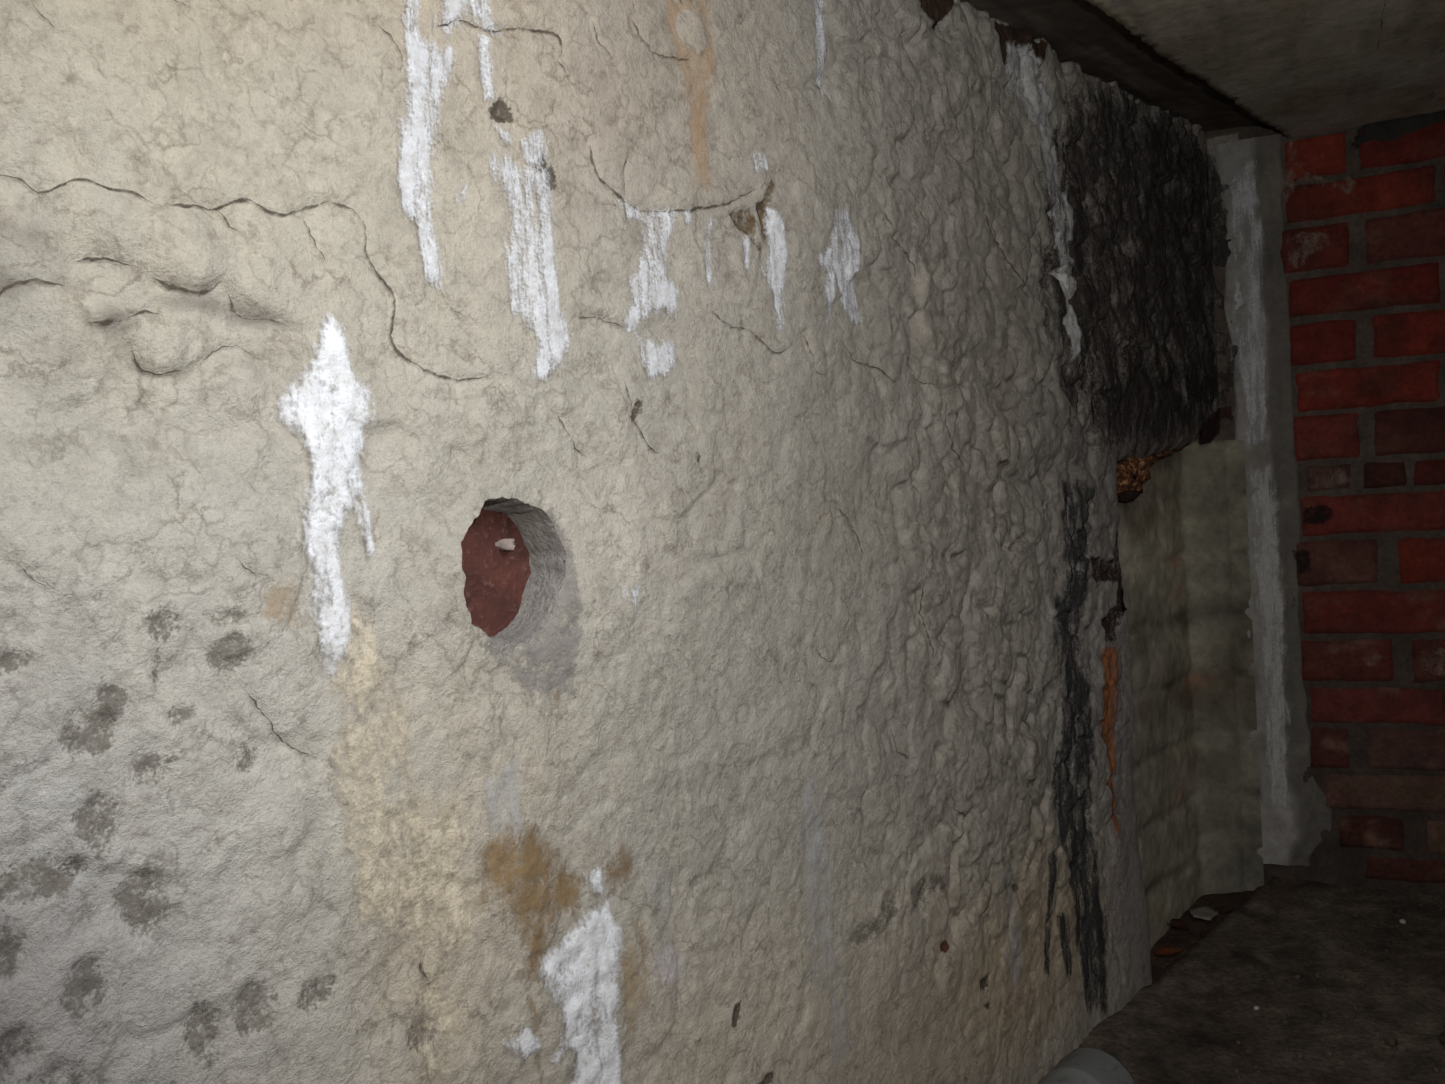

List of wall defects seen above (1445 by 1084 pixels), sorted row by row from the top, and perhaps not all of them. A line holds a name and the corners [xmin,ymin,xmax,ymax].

crack [438,20,569,76]
crack [631,1,690,61]
water stain [397,0,496,289]
crack [0,174,485,381]
water stain [490,126,570,380]
water stain [618,200,692,379]
corrosion [1116,446,1185,502]
flaking render [461,508,531,637]
water stain [277,315,474,1084]
corrosion [1101,648,1119,834]
corrosion [484,828,579,972]
water stain [507,867,623,1084]